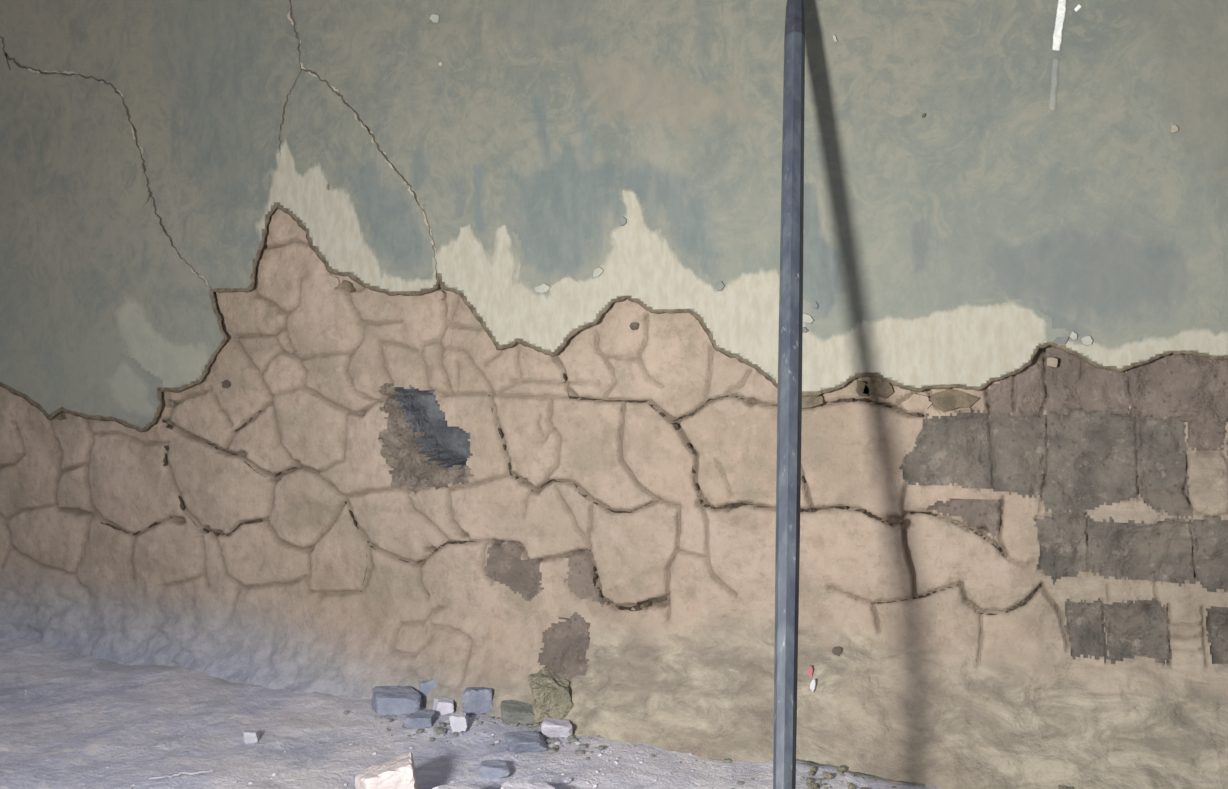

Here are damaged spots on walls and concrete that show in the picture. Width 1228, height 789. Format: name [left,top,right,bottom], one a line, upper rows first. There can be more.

crack [0,37,210,287]
crack [278,0,438,287]
water stain [902,0,1228,358]
crack [101,496,261,536]
spalling [0,133,780,762]
crack [488,395,654,513]
crack [593,566,667,611]
crack [563,373,777,510]
crack [817,398,923,417]
crack [800,476,1004,556]
crack [870,585,1041,615]
spalling [796,297,1228,789]